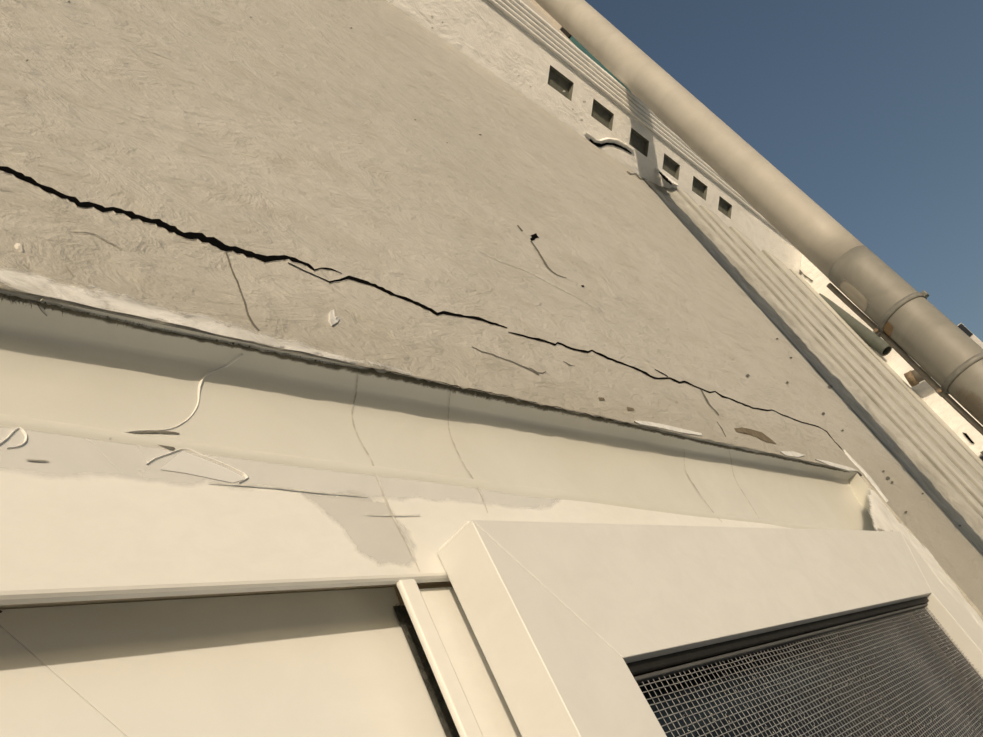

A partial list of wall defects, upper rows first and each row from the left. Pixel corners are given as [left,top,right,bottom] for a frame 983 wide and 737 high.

peeling [122,354,249,483]
peeling [0,264,411,375]
crack [208,373,420,572]
crack [0,165,845,522]